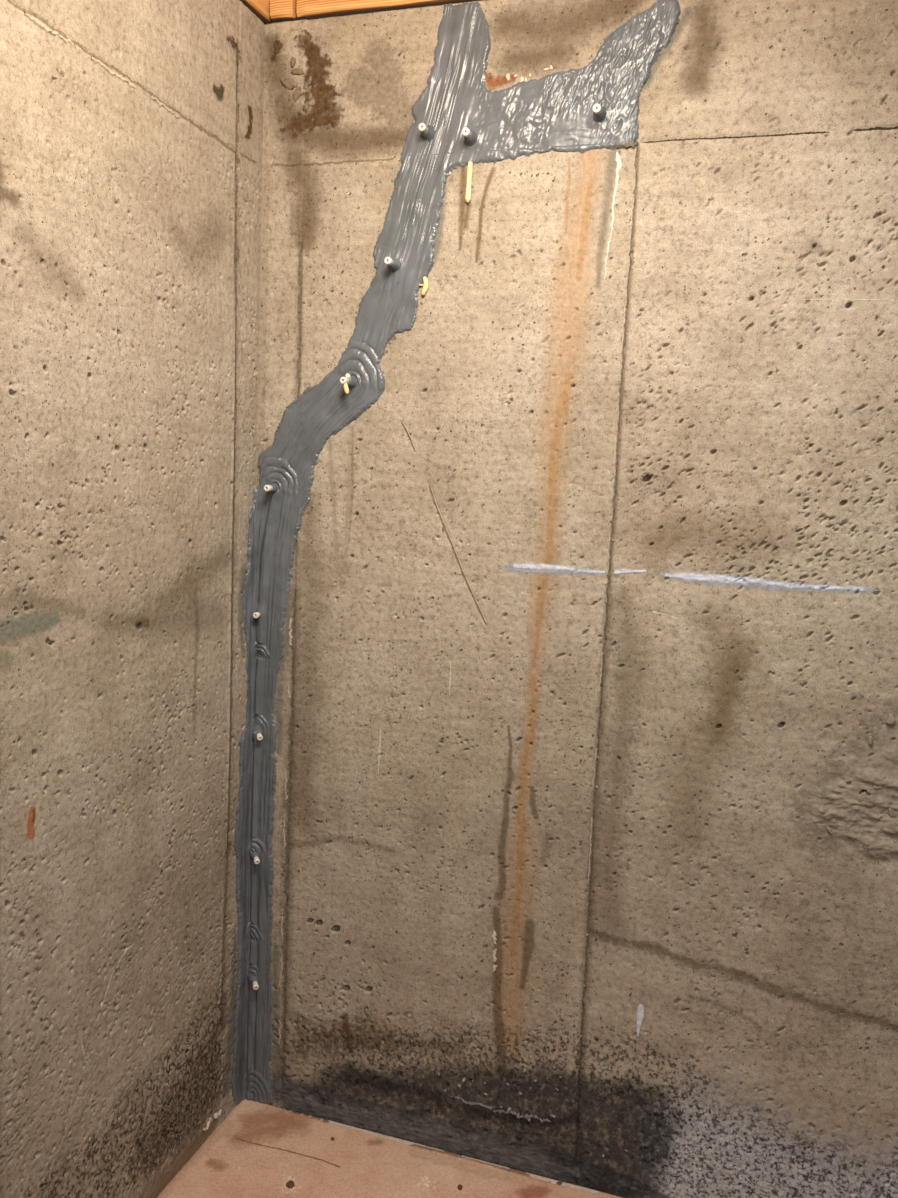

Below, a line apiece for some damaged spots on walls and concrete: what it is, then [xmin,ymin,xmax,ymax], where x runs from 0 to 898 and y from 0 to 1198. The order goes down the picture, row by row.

leakage [270,41,401,243]
crack [592,932,898,1032]
leakage [25,989,232,1198]
leakage [283,1025,898,1198]